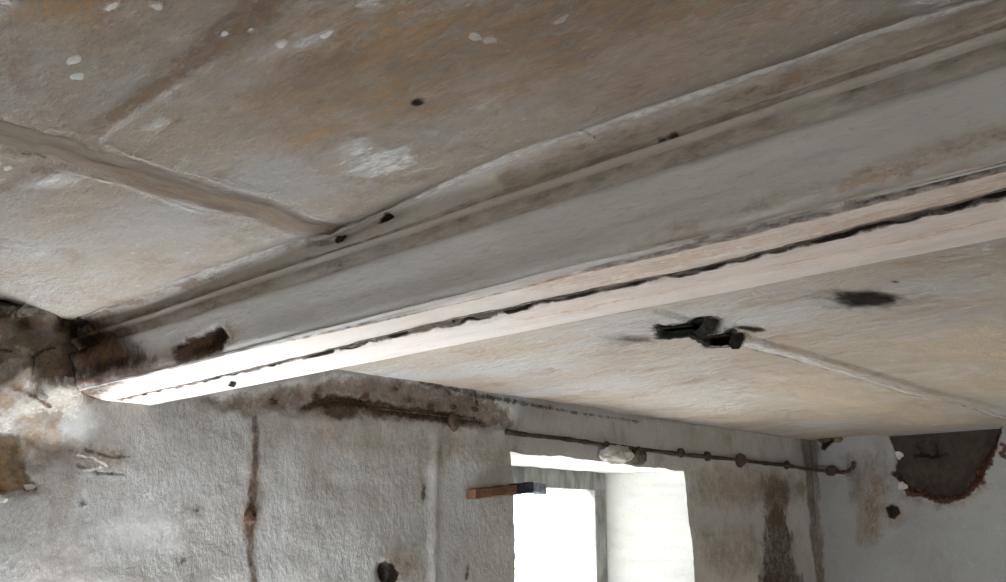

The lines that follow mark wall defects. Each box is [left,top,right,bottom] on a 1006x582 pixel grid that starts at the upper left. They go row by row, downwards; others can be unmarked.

spalling [0,300,130,503]
spalling [174,327,230,363]
crack [94,165,1006,401]
spalling [889,426,1002,505]